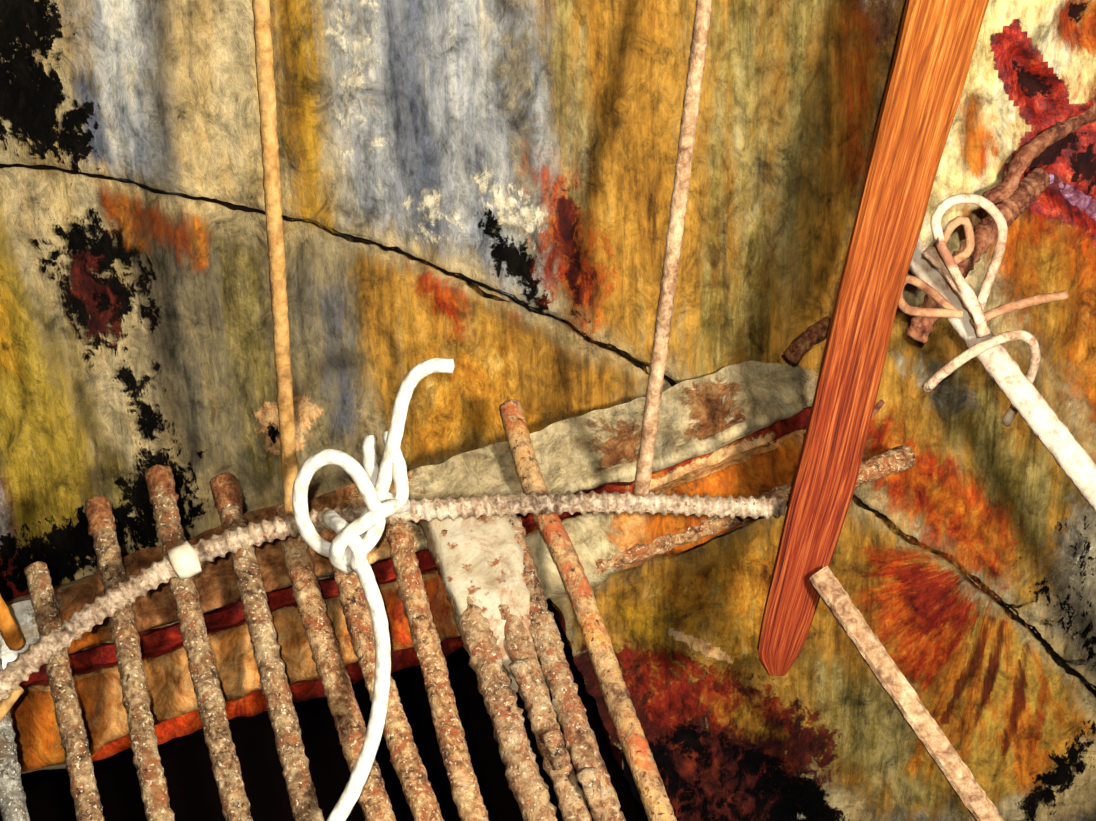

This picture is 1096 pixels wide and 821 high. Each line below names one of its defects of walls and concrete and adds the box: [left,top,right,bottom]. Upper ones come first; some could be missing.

water stain [0,0,169,195]
water stain [30,191,283,556]
crack [0,164,677,386]
water stain [325,0,561,313]
corrosion [538,0,697,361]
corrosion [668,0,907,378]
spalling [0,464,375,821]
spalling [358,675,445,821]
spalling [385,399,793,821]
corrosion [558,506,967,821]
corrosion [829,309,1094,805]
crack [852,493,1096,697]